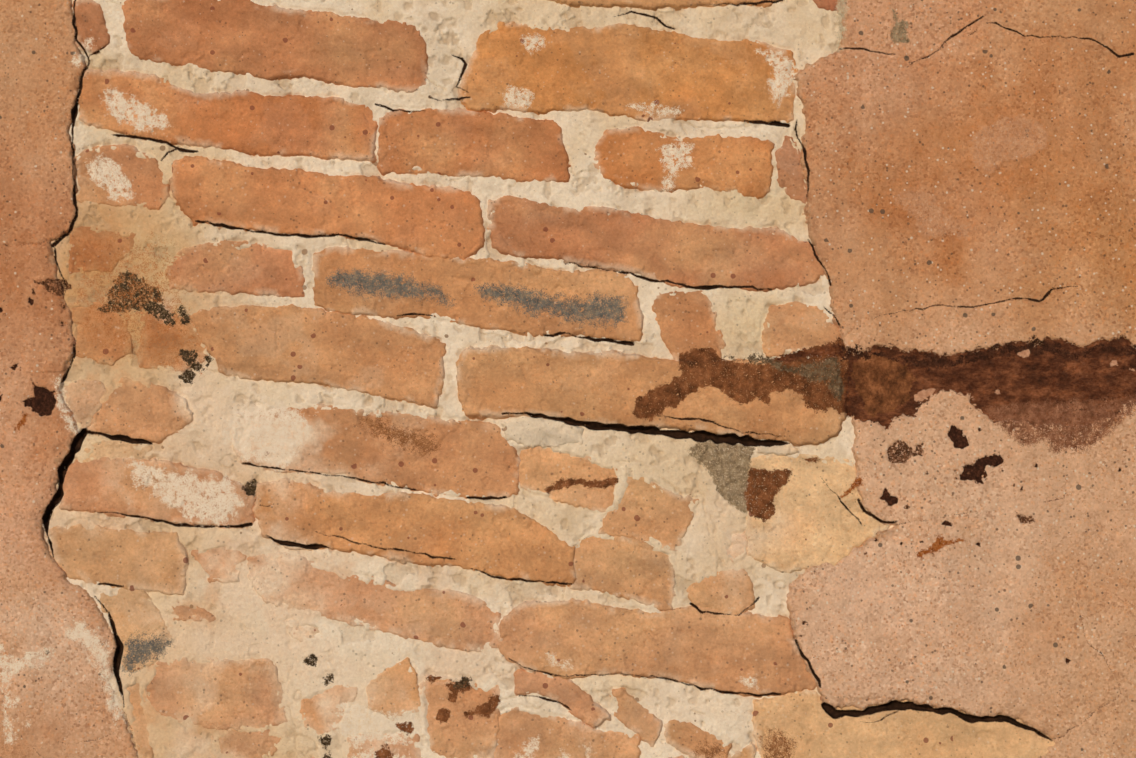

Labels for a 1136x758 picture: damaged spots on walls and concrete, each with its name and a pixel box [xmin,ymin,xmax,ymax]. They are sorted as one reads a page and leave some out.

flaking render [890,9,912,43]
crack [840,16,1135,68]
water stain [97,270,191,327]
crack [874,285,1078,319]
water stain [177,349,214,385]
water stain [632,337,849,422]
spalling [355,409,443,458]
crack [42,428,153,558]
spalling [880,488,910,509]
crack [33,582,136,755]
crack [795,579,1121,742]